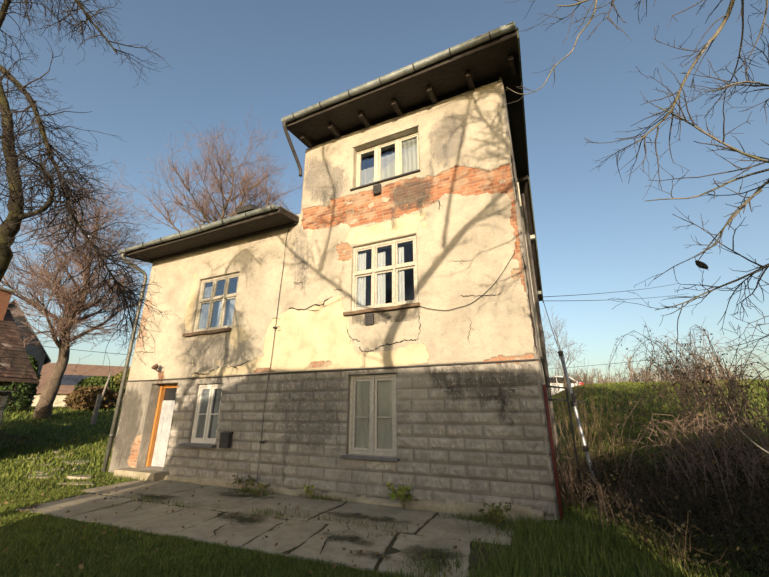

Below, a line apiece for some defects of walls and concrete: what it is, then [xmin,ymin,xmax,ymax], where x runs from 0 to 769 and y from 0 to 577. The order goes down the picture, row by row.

flaking render [301,164,534,321]
crack [272,289,343,331]
crack [346,315,421,353]